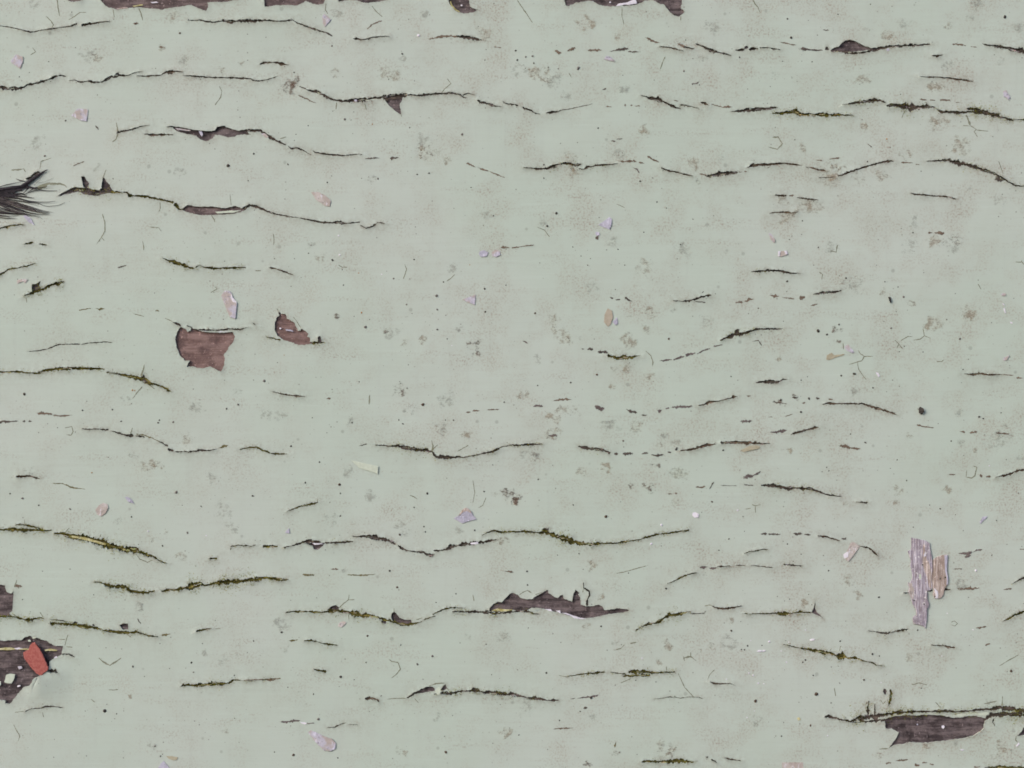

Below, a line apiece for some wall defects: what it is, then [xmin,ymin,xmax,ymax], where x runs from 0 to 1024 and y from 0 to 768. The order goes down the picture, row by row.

peeling [101,0,232,20]
peeling [801,40,930,54]
crack [466,43,1024,214]
peeling [165,291,255,371]
peeling [267,309,324,345]
crack [0,341,171,398]
crack [360,344,934,507]
crack [353,526,689,574]
crack [0,520,474,702]
peeling [452,582,629,619]
peeling [0,635,74,704]
peeling [825,689,1024,751]